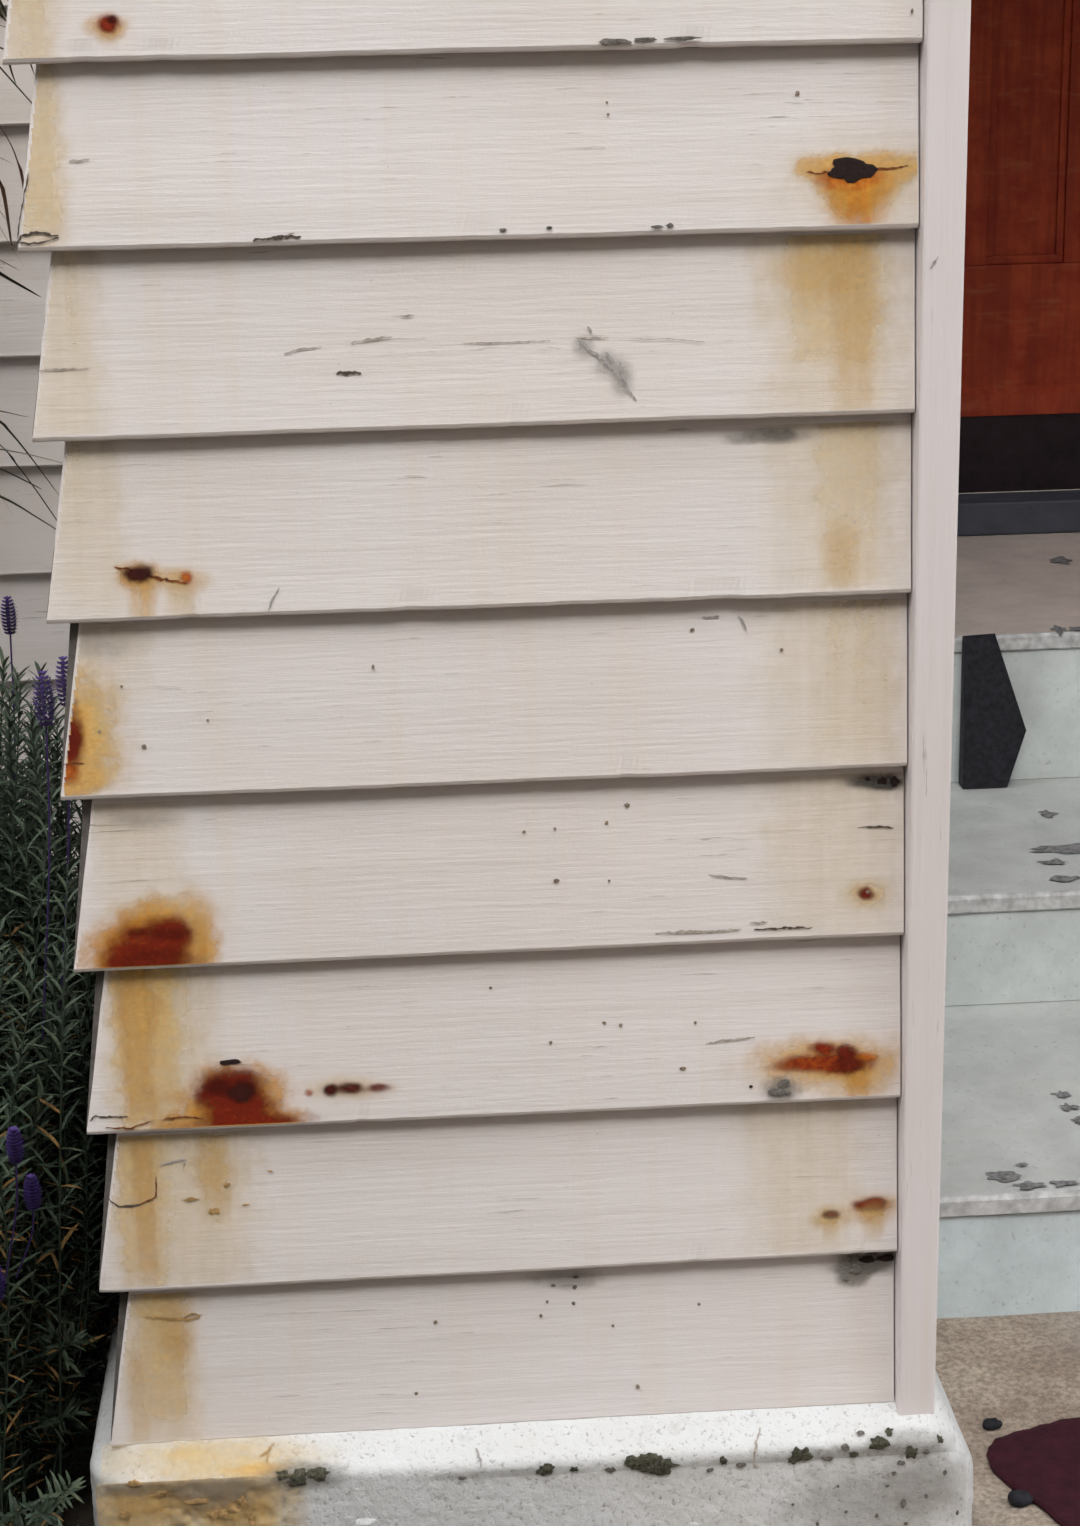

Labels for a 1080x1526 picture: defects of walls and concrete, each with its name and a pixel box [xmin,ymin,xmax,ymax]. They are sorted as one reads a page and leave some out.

corrosion [96,15,121,37]
corrosion [796,152,918,223]
corrosion [114,564,191,602]
corrosion [63,673,117,796]
corrosion [90,899,217,968]
corrosion [164,1067,299,1129]
corrosion [306,1083,387,1095]
corrosion [768,1043,893,1092]
corrosion [821,1211,838,1222]
corrosion [855,1198,888,1217]